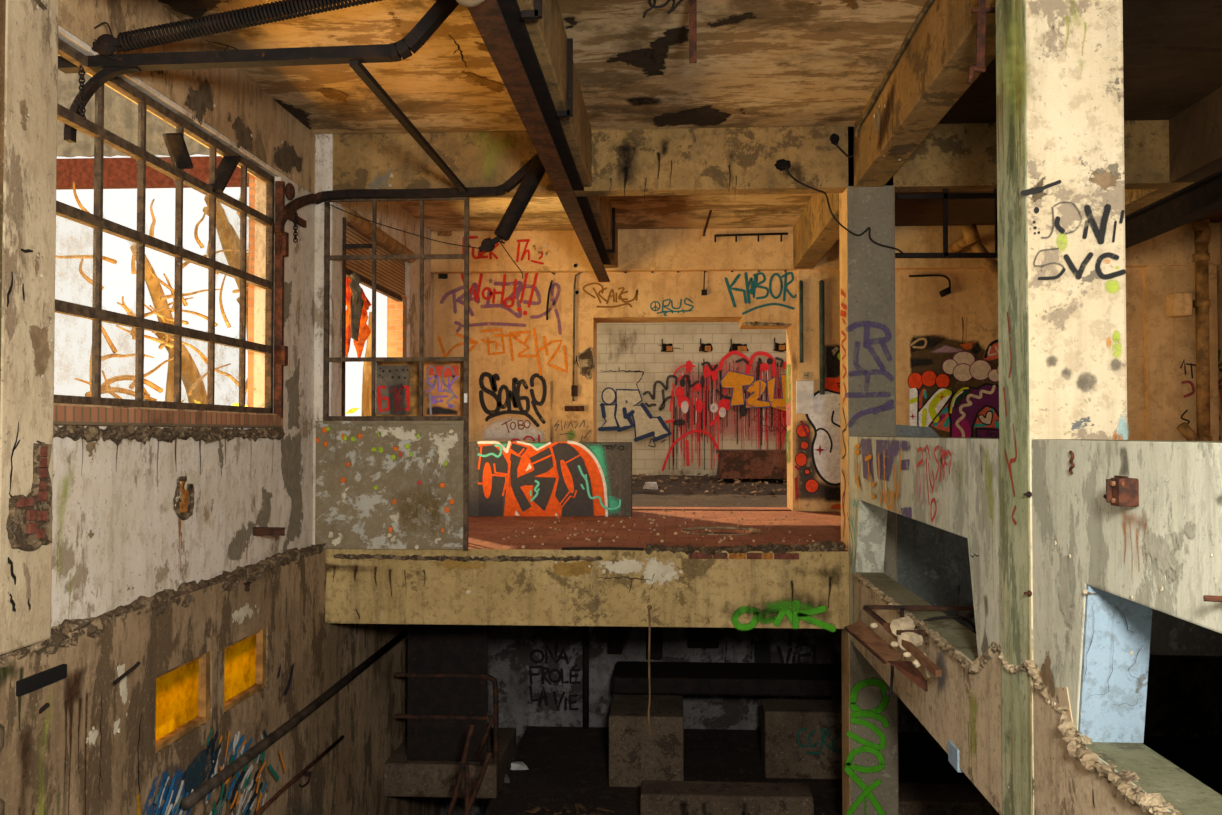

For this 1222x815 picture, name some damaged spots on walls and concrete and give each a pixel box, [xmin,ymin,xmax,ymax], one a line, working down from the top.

damp [604,27,689,77]
damp [610,142,636,196]
damp [627,98,745,198]
spalling [0,358,846,668]
corrosion [1123,516,1147,562]
damp [325,564,358,586]
damp [748,570,836,619]
damp [18,696,29,766]
damp [58,671,88,815]
peeling [86,663,130,747]
spalling [852,573,1184,815]